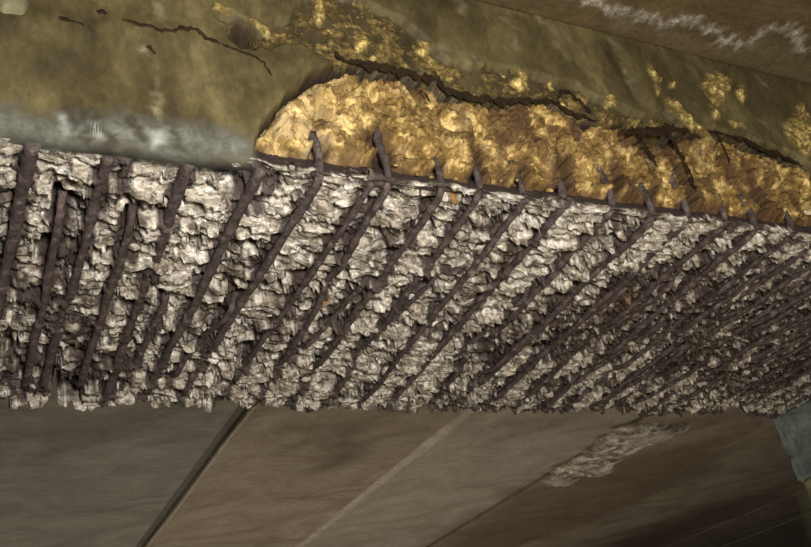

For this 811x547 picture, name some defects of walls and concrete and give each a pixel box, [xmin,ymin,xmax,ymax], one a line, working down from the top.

efflorescence [583,0,625,15]
crack [58,9,272,76]
corrosion [116,204,141,236]
corrosion [317,205,355,253]
corrosion [380,222,409,249]
spalling [0,0,811,420]
corrosion [52,318,101,395]
corrosion [187,238,263,343]
corrosion [250,291,305,353]
corrosion [449,244,520,317]
corrosion [473,261,811,393]
peeling [544,424,690,487]